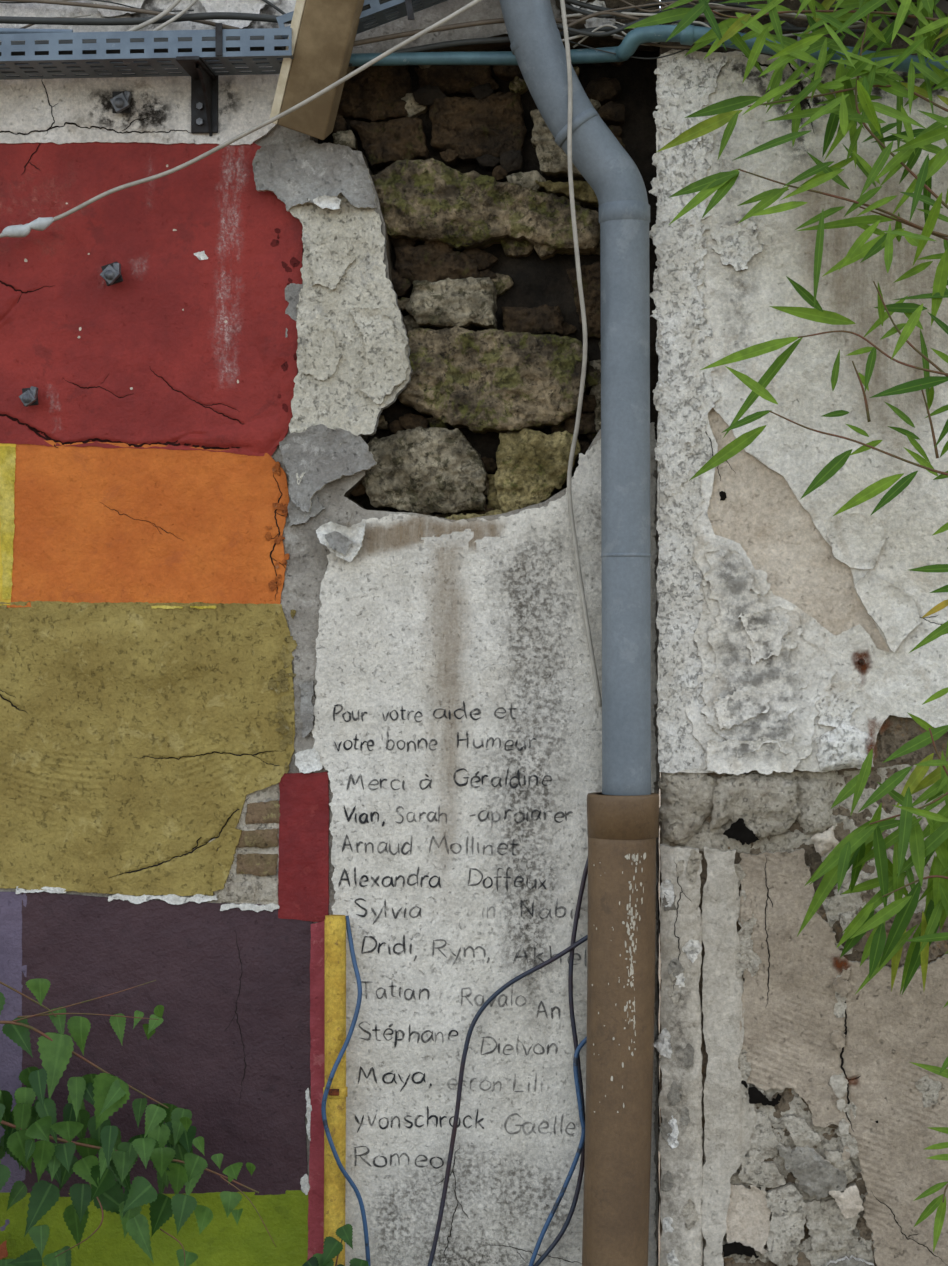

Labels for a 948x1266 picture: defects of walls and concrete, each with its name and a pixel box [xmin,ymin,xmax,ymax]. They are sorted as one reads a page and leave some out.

crack [0,80,190,175]
crack [0,369,243,450]
flaking render [108,47,601,912]
flaking render [555,0,948,1050]
crack [134,750,285,766]
damp [505,557,553,815]
corrosion [853,652,870,674]
peeling [16,886,67,894]
crack [109,799,247,878]
peeling [598,853,646,1113]
crack [840,978,860,1132]
flaking render [722,1049,874,1266]